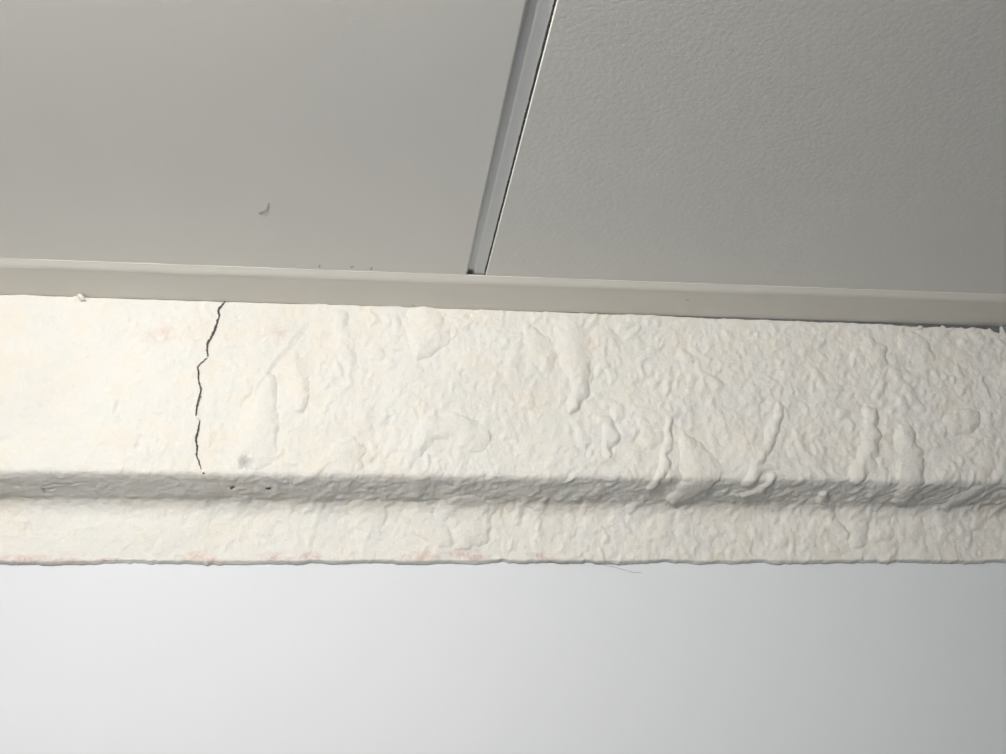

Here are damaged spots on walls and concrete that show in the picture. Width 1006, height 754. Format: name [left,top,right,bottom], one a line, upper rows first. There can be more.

crack [195,301,226,474]